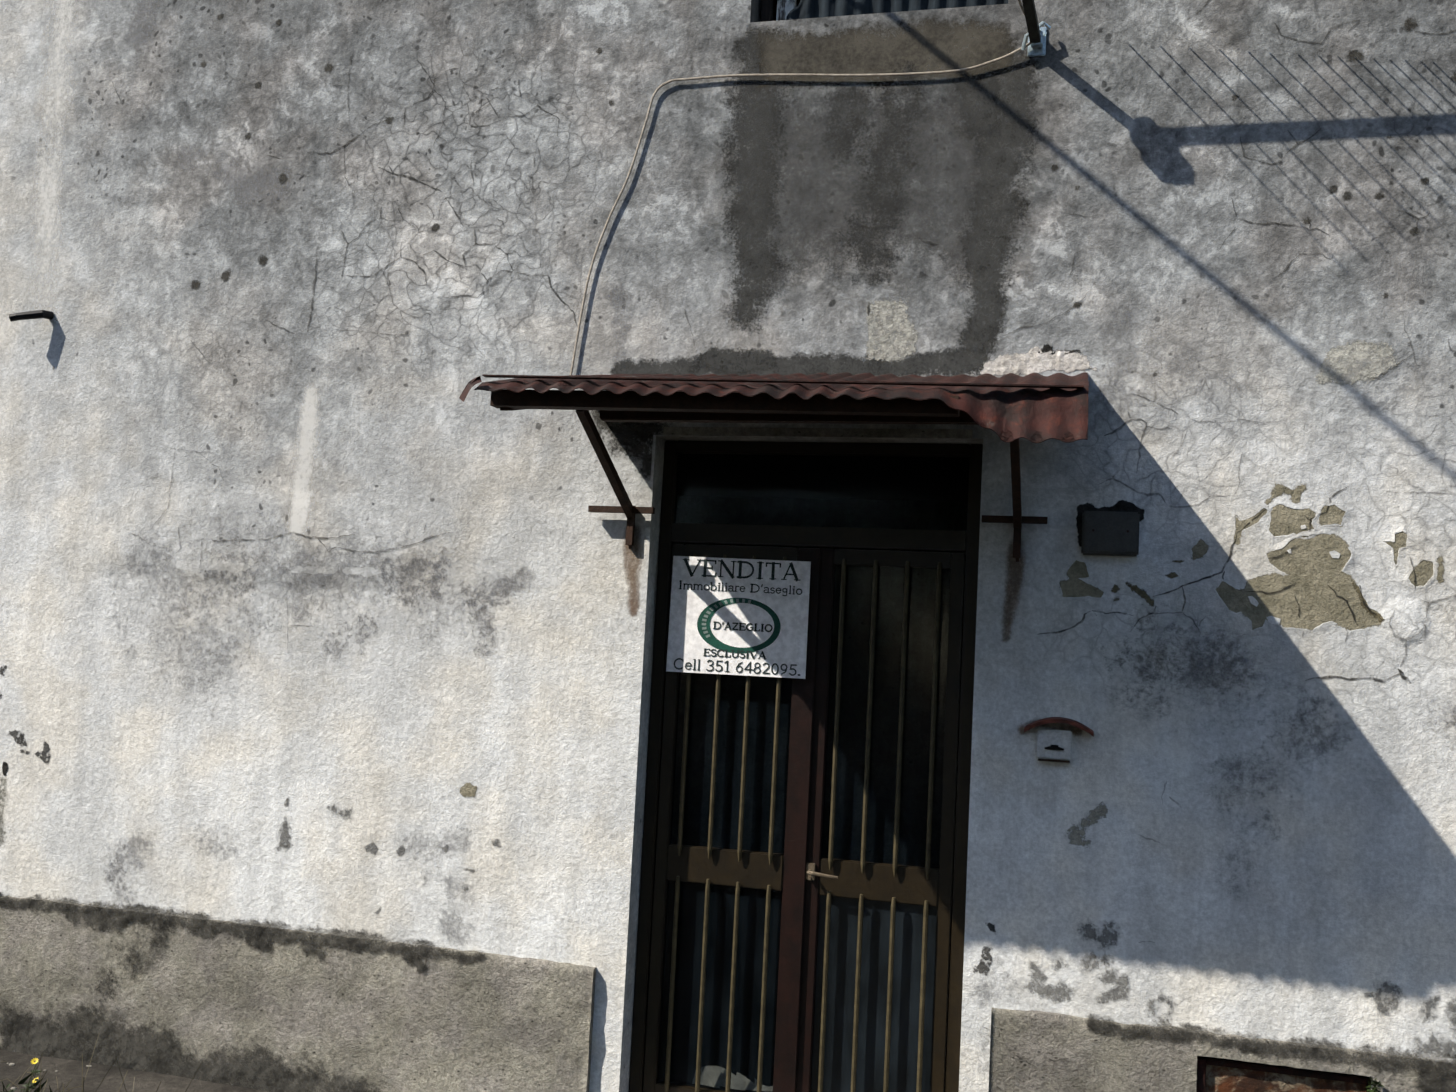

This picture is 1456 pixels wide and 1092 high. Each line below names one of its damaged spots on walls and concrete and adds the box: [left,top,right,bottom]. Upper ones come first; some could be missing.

crack [267,60,576,334]
water stain [610,18,1059,377]
crack [1223,201,1331,275]
water stain [1330,185,1351,200]
peeling [1054,500,1154,606]
crack [1040,509,1266,634]
peeling [1166,484,1444,639]
crack [1305,487,1347,526]
crack [1305,669,1407,682]
peeling [2,730,50,776]
water stain [0,892,486,1092]
water stain [1086,1014,1456,1092]